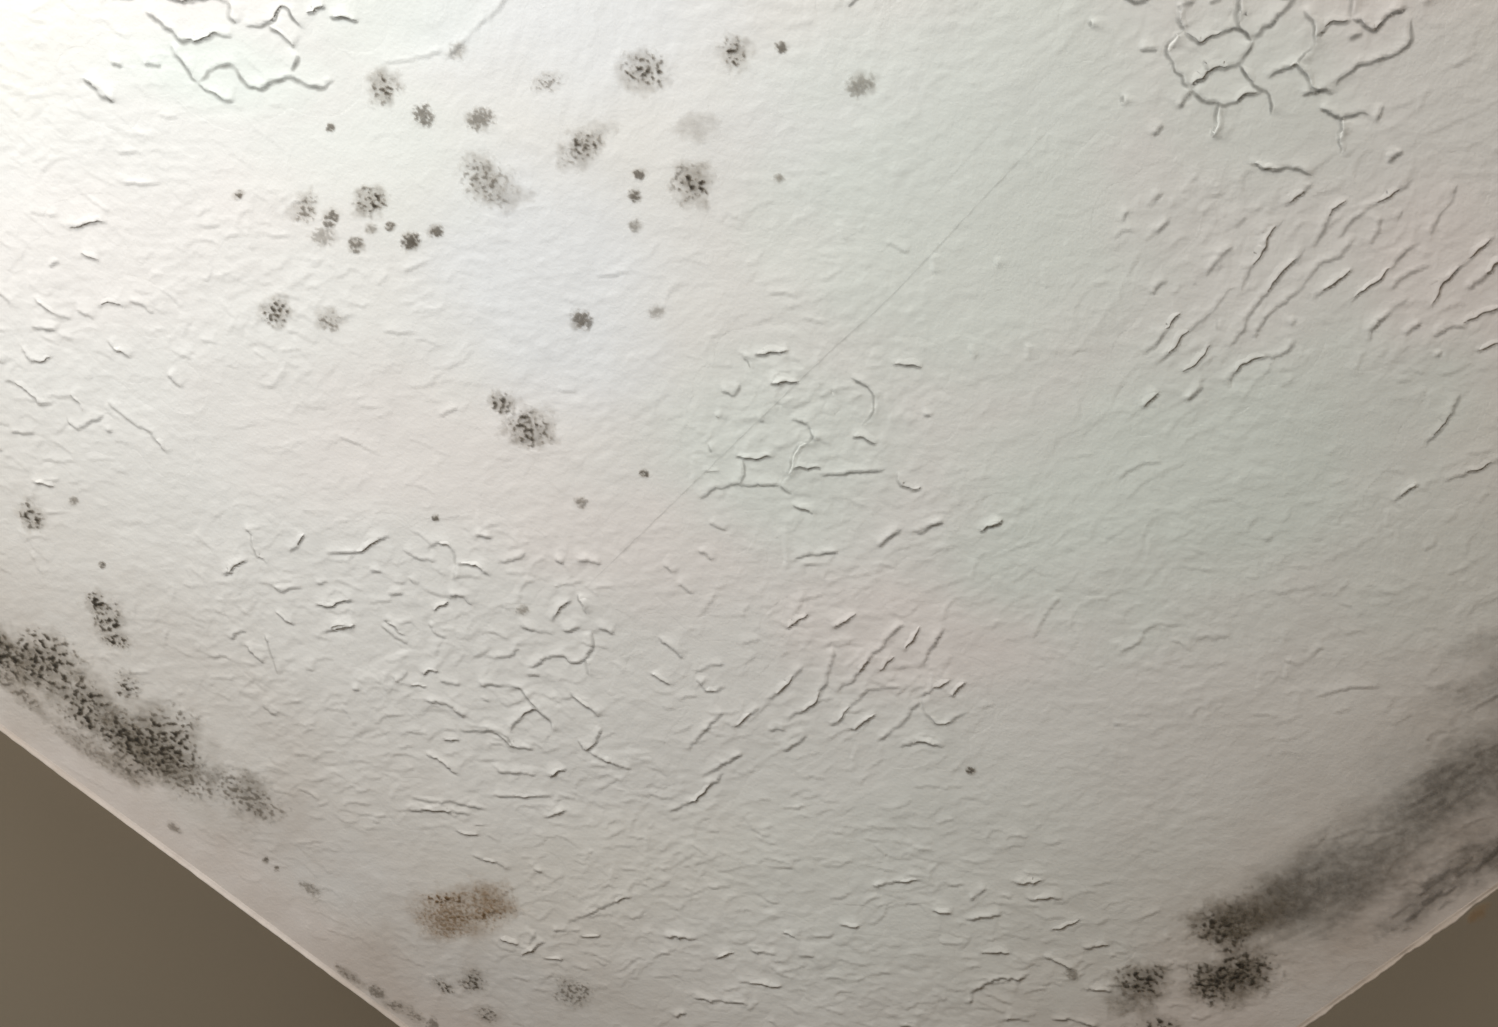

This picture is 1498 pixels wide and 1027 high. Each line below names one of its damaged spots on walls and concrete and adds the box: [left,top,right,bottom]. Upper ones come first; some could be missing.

crack [56,0,389,131]
crack [1057,0,1460,195]
damp [386,223,442,248]
peeling [0,193,207,520]
damp [513,415,544,441]
peeling [1092,149,1498,532]
damp [88,592,126,647]
crack [199,322,1032,839]
damp [0,631,203,791]
peeling [644,589,997,834]
damp [1118,969,1163,996]
damp [1189,852,1384,1005]